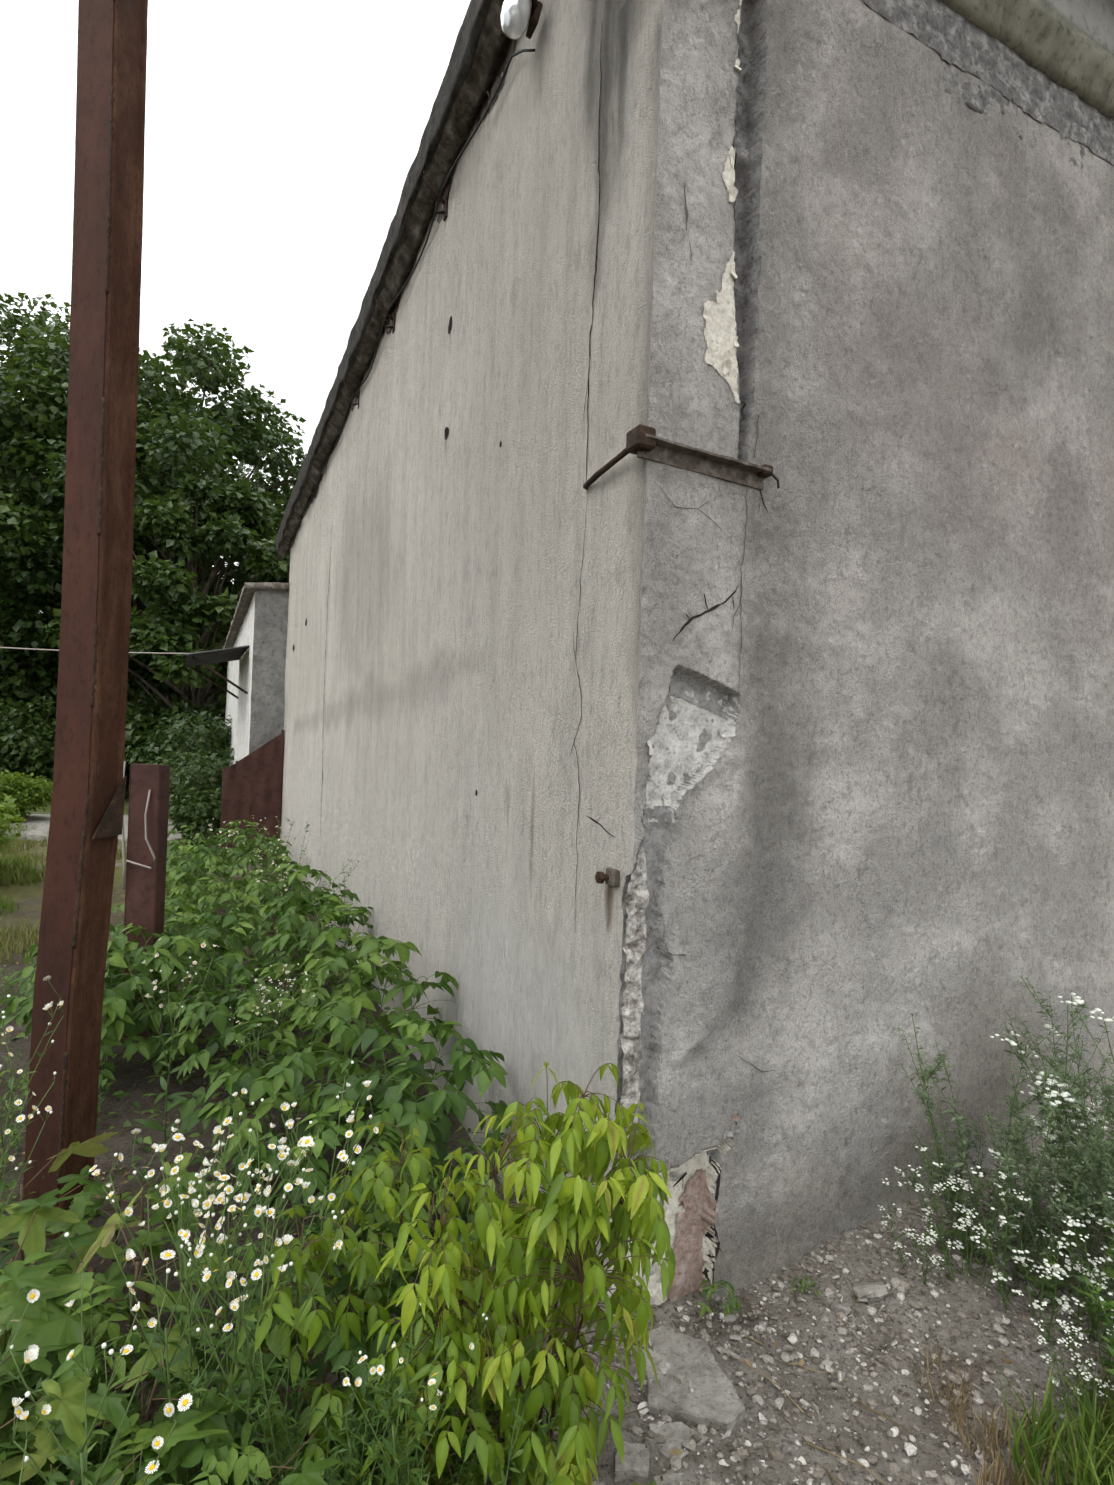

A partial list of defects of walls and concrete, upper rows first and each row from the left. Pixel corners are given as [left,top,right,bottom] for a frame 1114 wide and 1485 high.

crack [570,22,616,933]
crack [660,0,768,679]
peeling [703,251,740,403]
peeling [722,145,735,191]
flaking render [864,0,1114,165]
flaking render [605,666,741,1317]